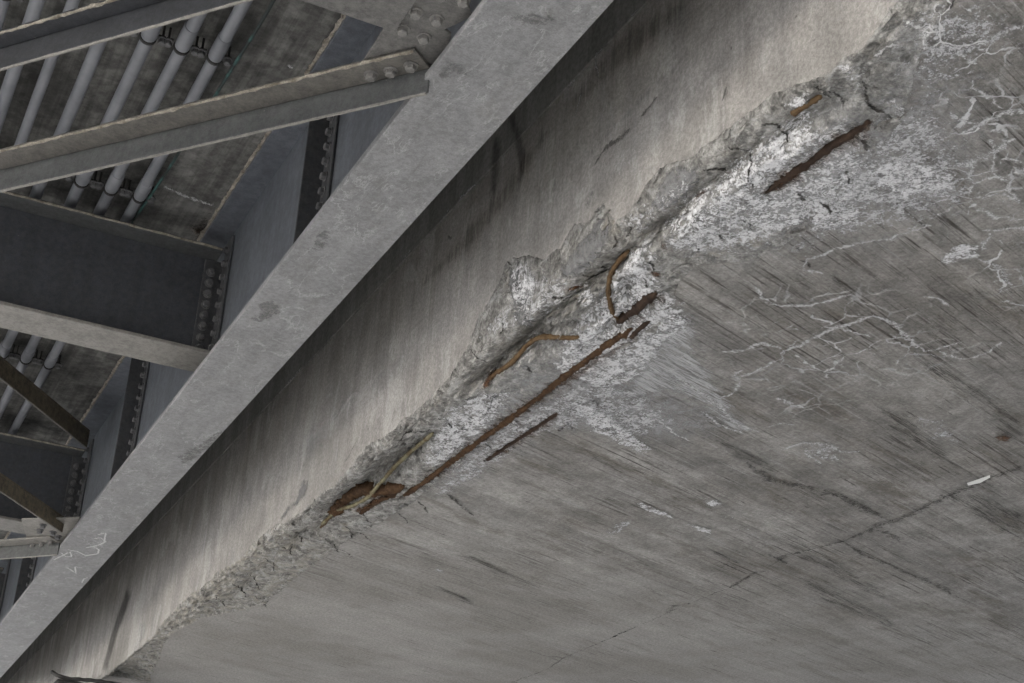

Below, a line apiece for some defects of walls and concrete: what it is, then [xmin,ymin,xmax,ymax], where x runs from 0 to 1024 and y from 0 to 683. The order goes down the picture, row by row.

spalling [460,0,955,385]
leakage [420,0,1011,495]
crack [746,150,754,188]
crack [815,84,892,119]
crack [803,224,931,274]
crack [874,0,1024,306]
spalling [106,313,665,683]
corrosion [331,334,640,518]
crack [671,286,1017,609]